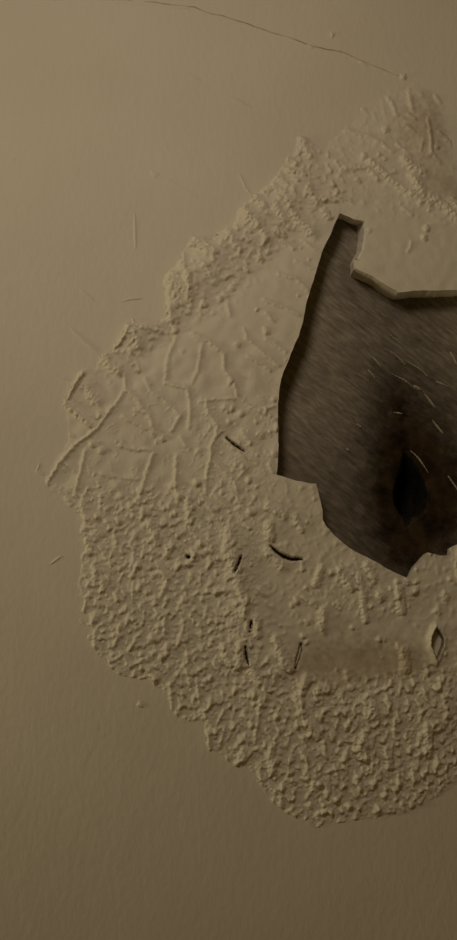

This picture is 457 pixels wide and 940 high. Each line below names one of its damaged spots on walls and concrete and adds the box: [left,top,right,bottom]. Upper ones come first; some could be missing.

peeling [89,136,457,382]
spalling [392,450,428,527]
spalling [64,501,457,828]